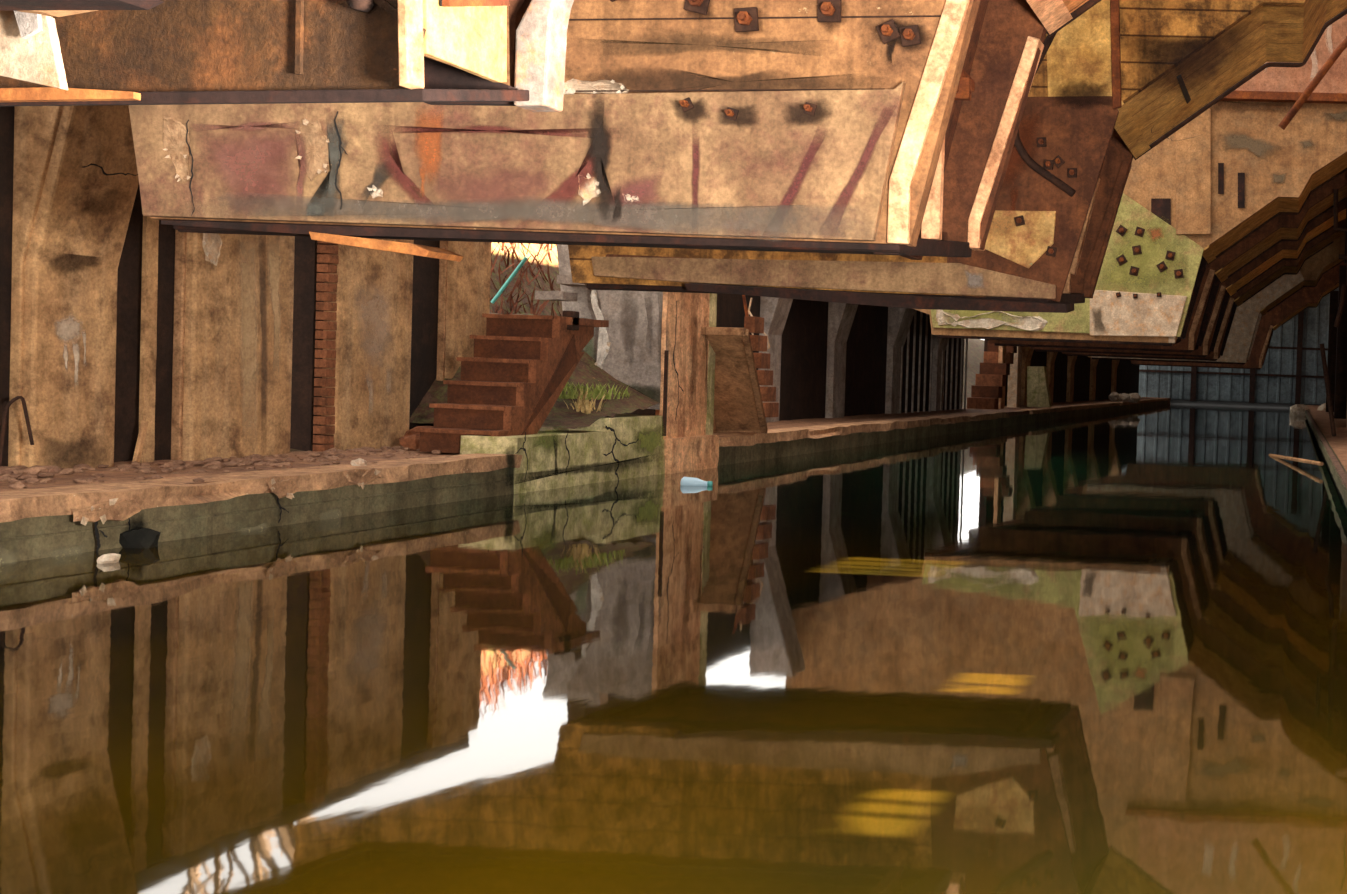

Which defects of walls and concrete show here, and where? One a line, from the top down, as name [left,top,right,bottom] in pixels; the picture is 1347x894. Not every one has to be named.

corrosion [789,103,827,124]
crack [82,163,138,176]
corrosion [779,143,820,210]
corrosion [826,119,888,222]